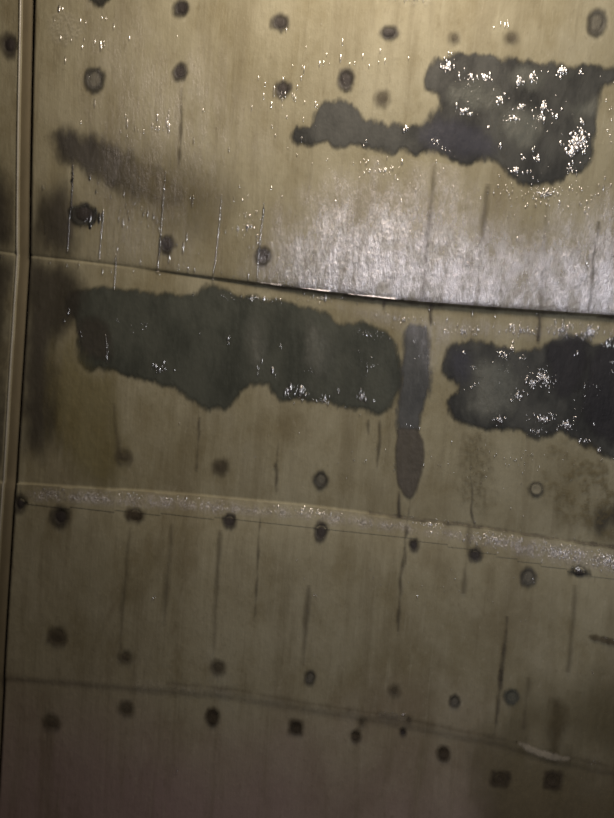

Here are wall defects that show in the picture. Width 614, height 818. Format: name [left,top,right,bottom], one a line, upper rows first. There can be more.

damp [292,52,614,186]
damp [56,130,206,207]
damp [0,182,12,243]
damp [0,259,12,330]
damp [23,264,430,497]
damp [442,335,614,458]
crack [391,500,549,538]